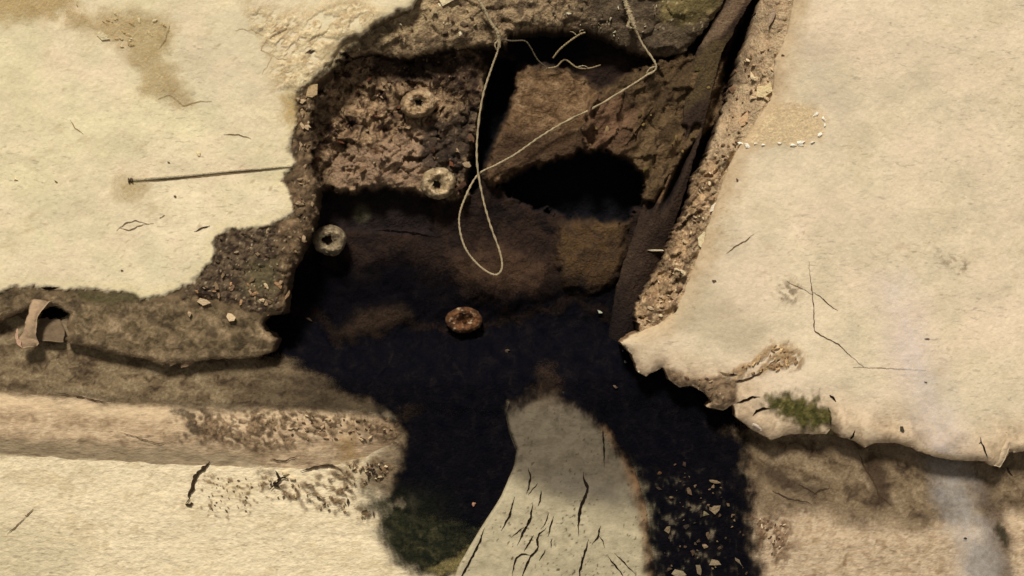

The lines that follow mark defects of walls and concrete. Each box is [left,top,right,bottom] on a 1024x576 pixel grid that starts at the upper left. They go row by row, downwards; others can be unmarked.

spalling [180,0,826,331]
peeling [15,298,51,348]
spalling [331,300,415,341]
crack [790,269,912,370]
spalling [665,343,803,409]
peeling [182,407,402,452]
damp [0,250,1024,576]
peeling [185,457,394,519]
crack [461,427,631,576]